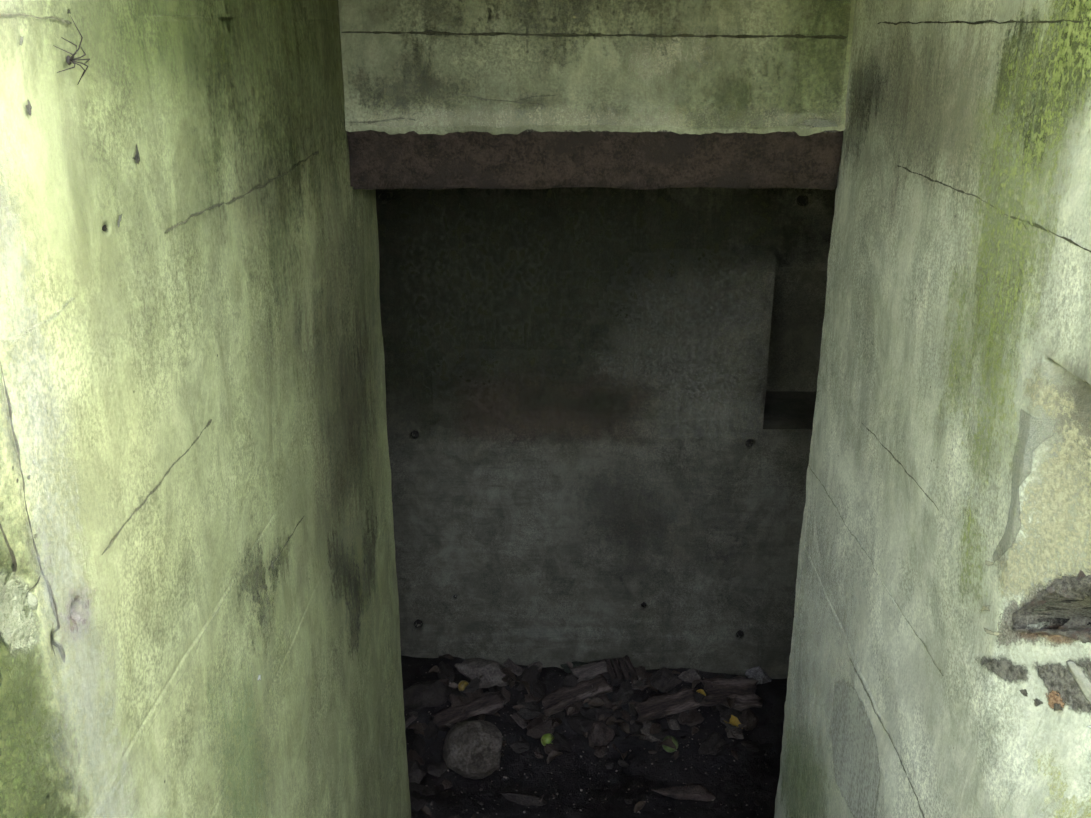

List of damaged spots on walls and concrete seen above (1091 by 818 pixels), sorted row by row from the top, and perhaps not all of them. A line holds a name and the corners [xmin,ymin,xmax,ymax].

crack [341,30,847,39]
crack [877,18,1091,26]
crack [353,116,413,124]
crack [165,152,319,233]
crack [898,166,1091,253]
water stain [328,517,377,657]
spalling [980,656,1091,715]